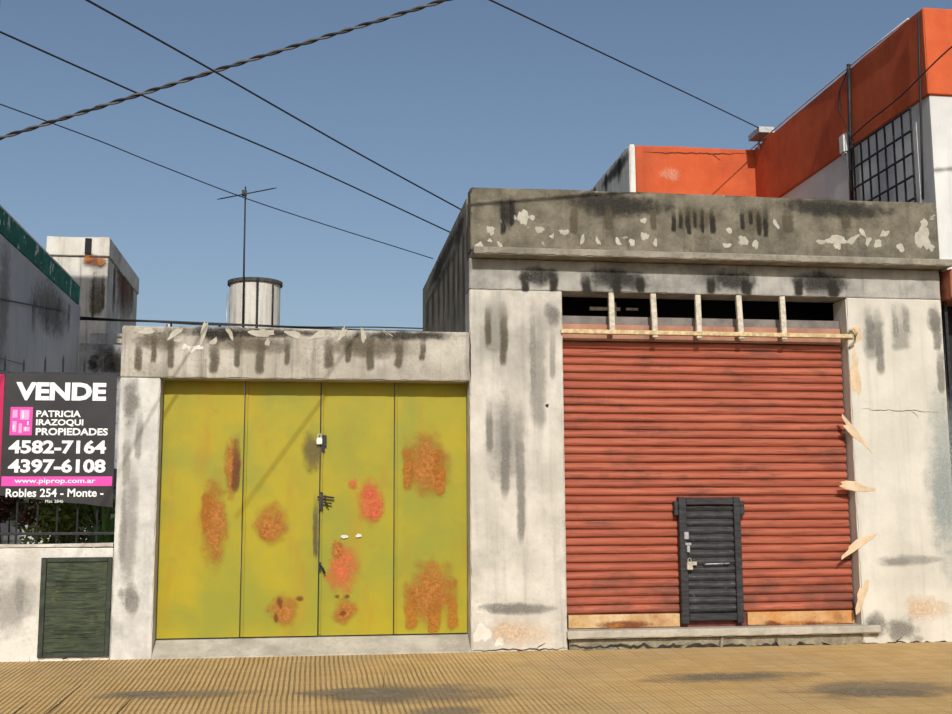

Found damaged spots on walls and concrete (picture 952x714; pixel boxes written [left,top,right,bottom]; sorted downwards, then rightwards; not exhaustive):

peeling [514,209,569,238]
leakage [571,154,656,233]
leakage [783,199,880,232]
peeling [816,228,889,250]
peeling [915,219,935,252]
leakage [325,218,468,369]
flaking render [167,321,233,353]
leakage [135,326,313,373]
corrosion [403,436,446,494]
corrosion [202,447,240,558]
corrosion [332,542,355,623]
corrosion [405,561,458,632]